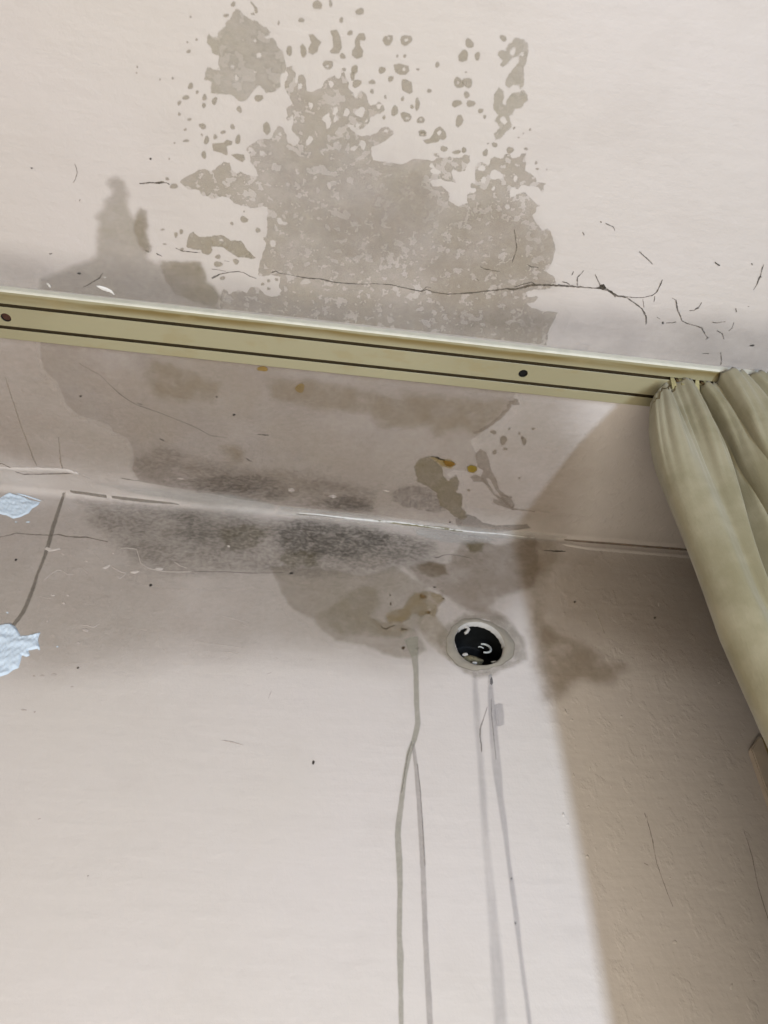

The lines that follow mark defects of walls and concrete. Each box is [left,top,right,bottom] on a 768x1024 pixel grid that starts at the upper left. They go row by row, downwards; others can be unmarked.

damp [287,35,320,56]
damp [324,18,365,86]
damp [200,124,244,159]
damp [176,230,255,266]
crack [148,230,763,365]
damp [477,427,535,454]
damp [416,458,517,532]
damp [400,637,419,801]